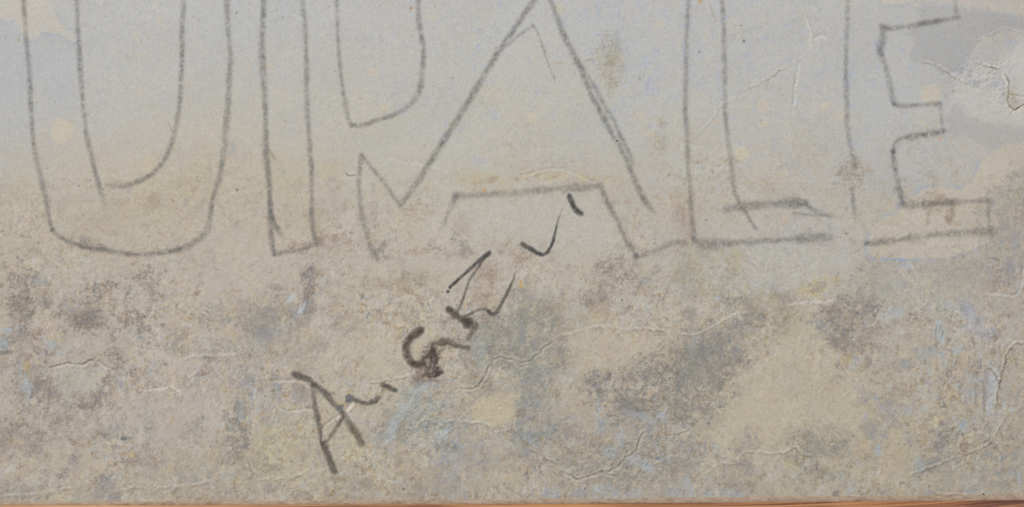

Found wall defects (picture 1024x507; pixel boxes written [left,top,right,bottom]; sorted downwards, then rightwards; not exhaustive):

crack [451,335,558,393]
crack [907,339,1024,496]